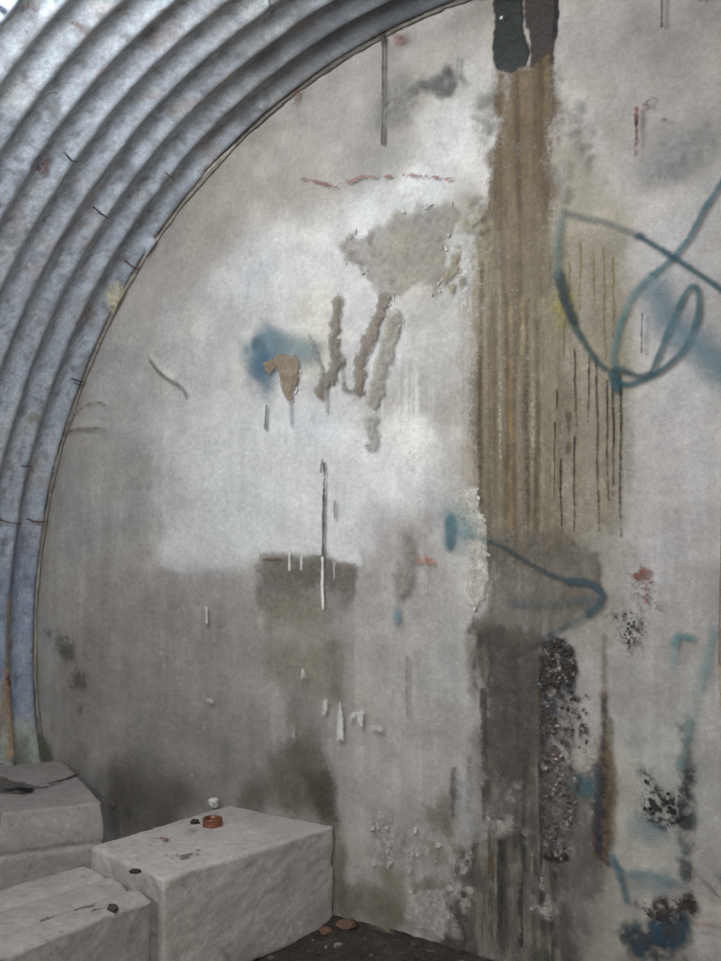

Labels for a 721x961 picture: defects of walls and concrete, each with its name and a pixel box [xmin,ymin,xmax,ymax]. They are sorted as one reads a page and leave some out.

rust [471,55,578,566]
damp [448,234,627,961]
damp [239,640,338,824]
damp [426,760,473,837]
damp [674,726,696,880]